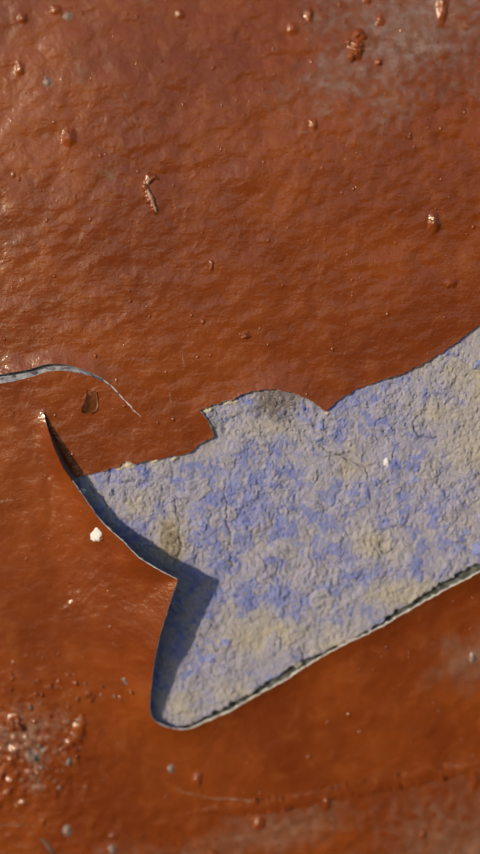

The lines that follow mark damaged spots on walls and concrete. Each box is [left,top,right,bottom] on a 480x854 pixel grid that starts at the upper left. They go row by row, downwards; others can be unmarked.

crack [0,364,141,417]
flaking render [0,325,480,793]